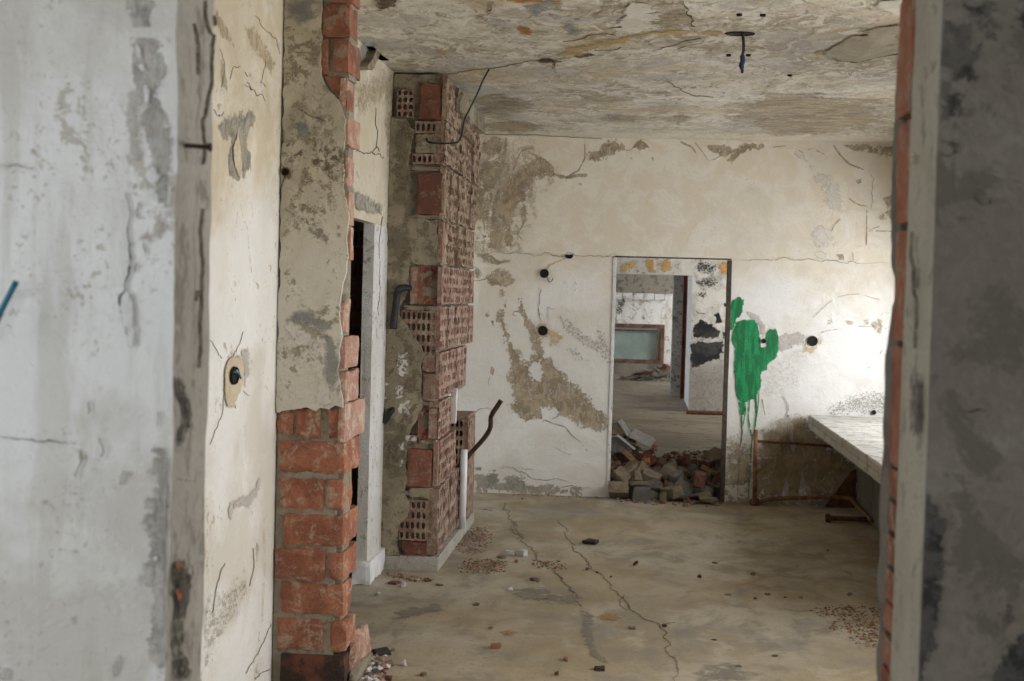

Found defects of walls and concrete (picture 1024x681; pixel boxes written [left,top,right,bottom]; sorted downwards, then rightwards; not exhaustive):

crack [192,0,280,165]
crack [445,34,622,76]
spalling [218,110,256,180]
crack [356,113,384,159]
peeling [487,139,649,251]
peeling [678,139,785,163]
crack [118,193,146,336]
spalling [474,269,609,451]
damp [720,417,880,507]
crack [212,563,225,613]
crack [557,521,679,677]
crack [245,624,272,680]